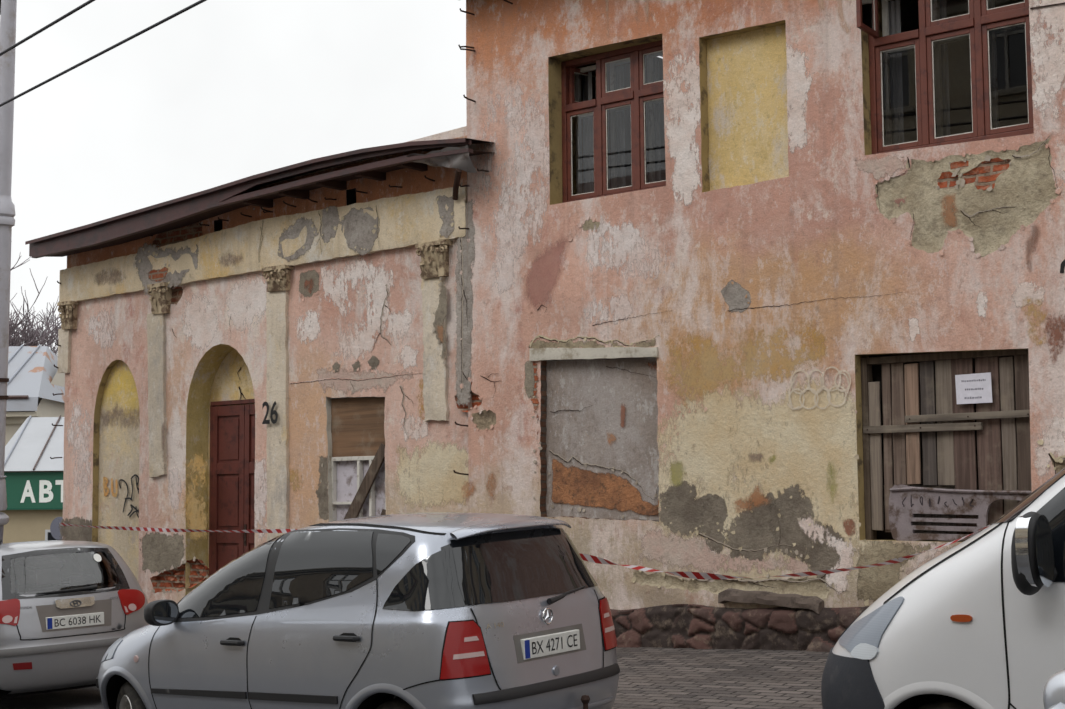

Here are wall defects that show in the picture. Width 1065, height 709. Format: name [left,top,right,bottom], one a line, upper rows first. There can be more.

peeling [1029,0,1065,129]
peeling [135,221,267,350]
peeling [278,206,419,394]
peeling [432,79,550,431]
peeling [721,280,751,312]
spalling [854,137,1065,258]
peeling [524,336,960,606]
peeling [1034,416,1065,477]
spalling [150,557,209,593]